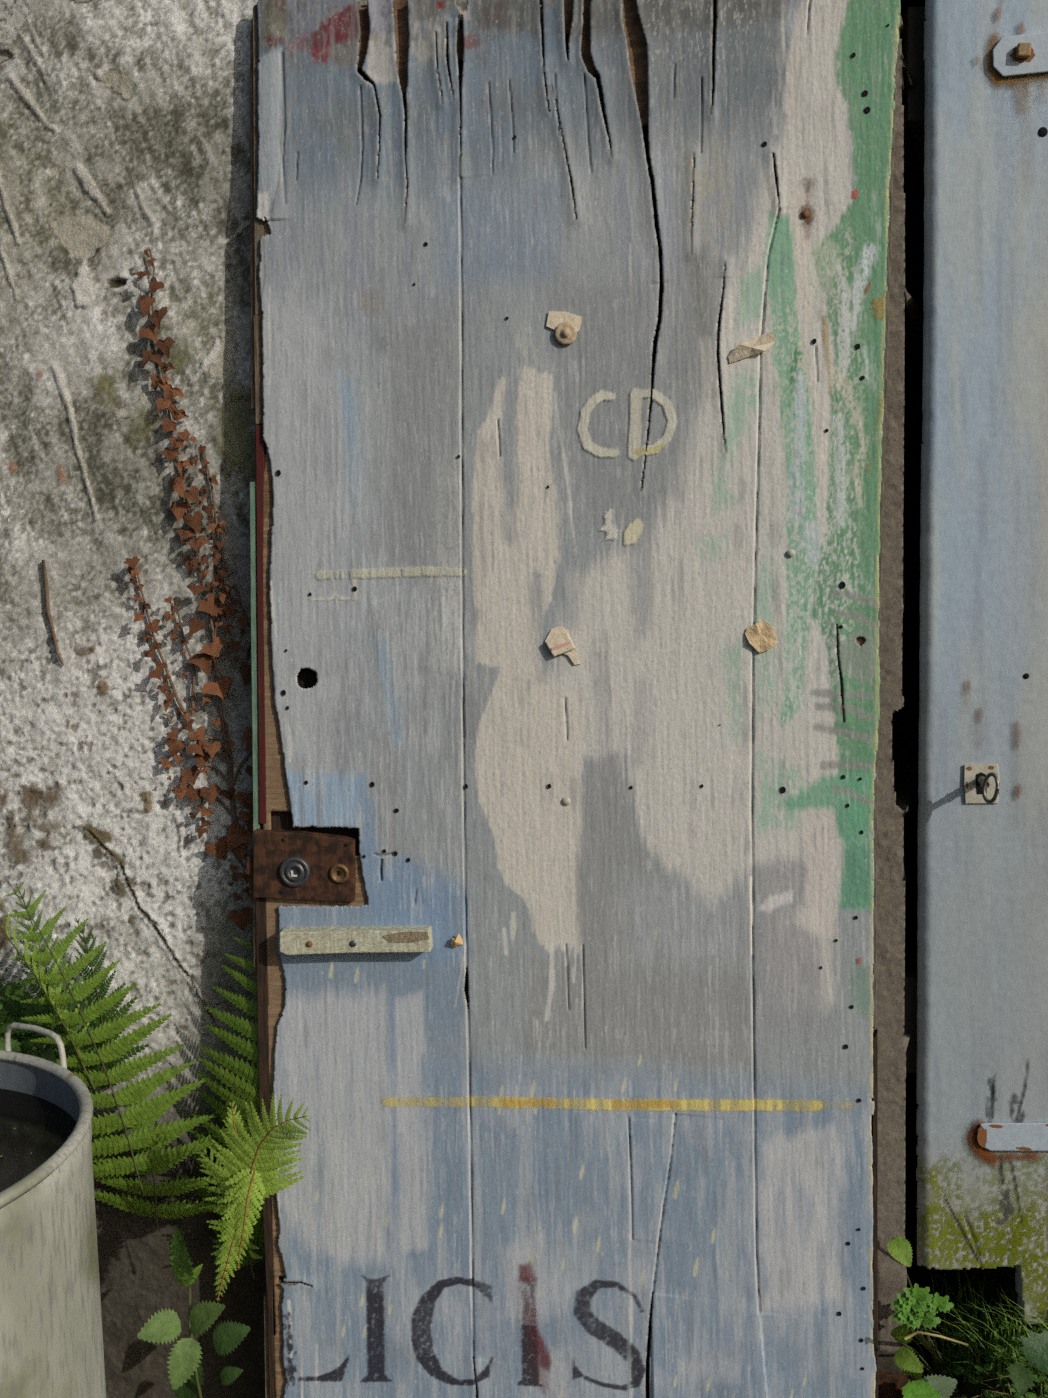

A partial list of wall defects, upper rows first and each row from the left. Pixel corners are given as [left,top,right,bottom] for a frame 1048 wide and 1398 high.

crack [173,813,182,857]
crack [100,843,223,1037]
rust [969,1121,1039,1166]